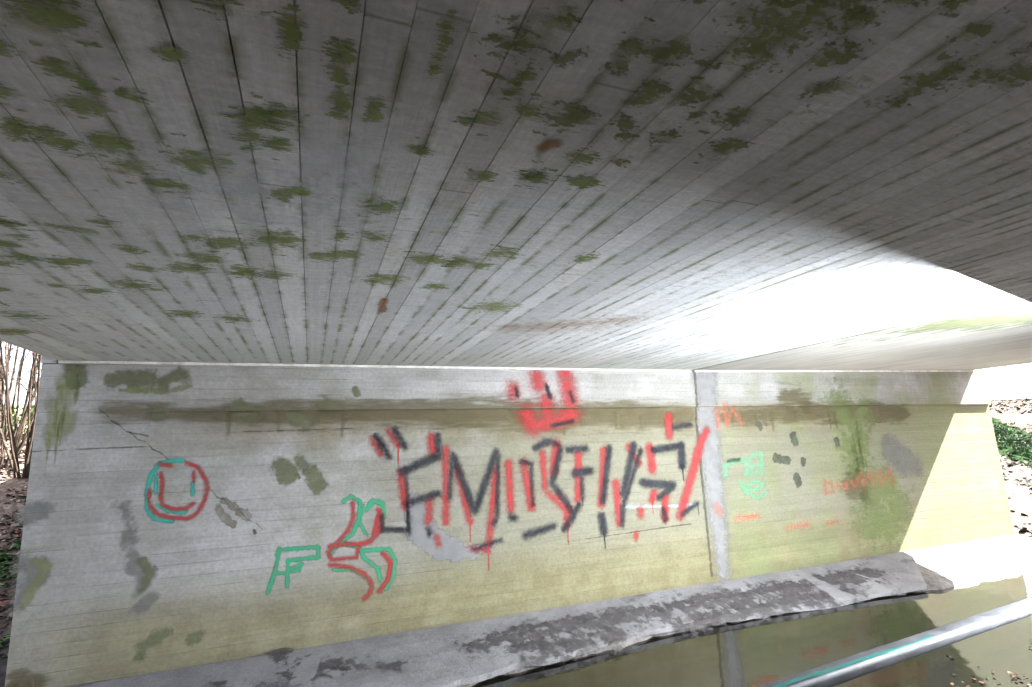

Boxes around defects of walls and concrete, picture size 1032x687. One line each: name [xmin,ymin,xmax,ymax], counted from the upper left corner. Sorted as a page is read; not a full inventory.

leakage [120,502,158,612]